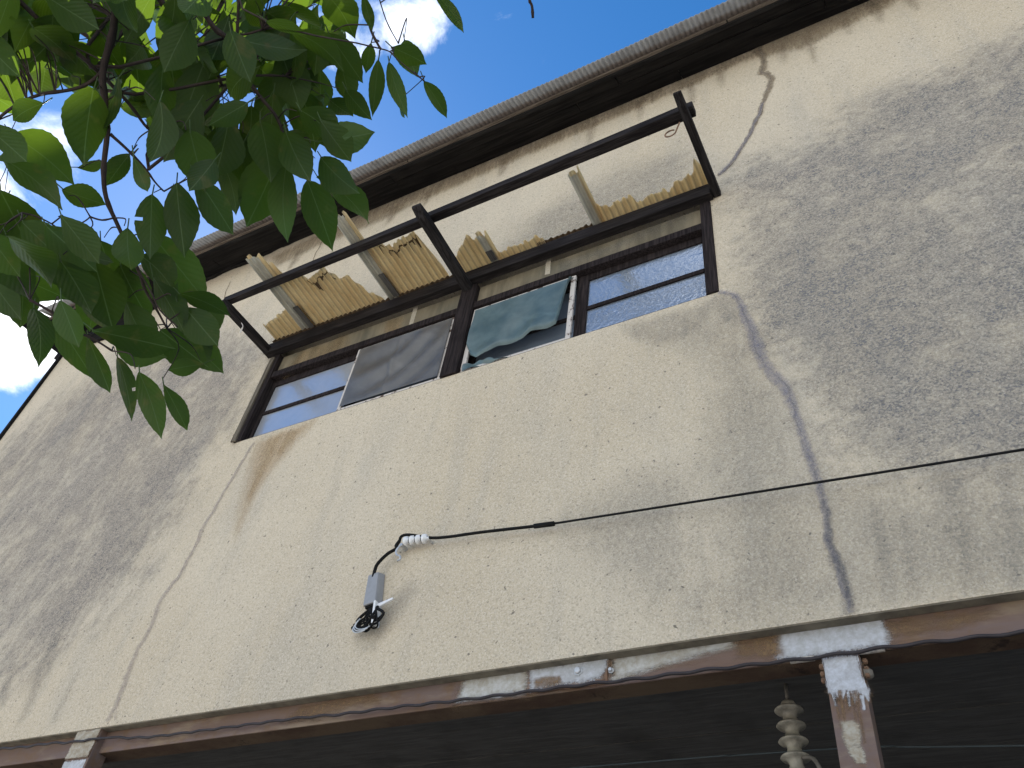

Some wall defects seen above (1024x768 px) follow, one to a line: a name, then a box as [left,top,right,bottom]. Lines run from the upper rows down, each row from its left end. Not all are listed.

crack [717,46,775,175]
mould [748,48,1024,461]
water stain [0,336,236,651]
crack [719,291,850,603]
peeling [459,620,891,763]